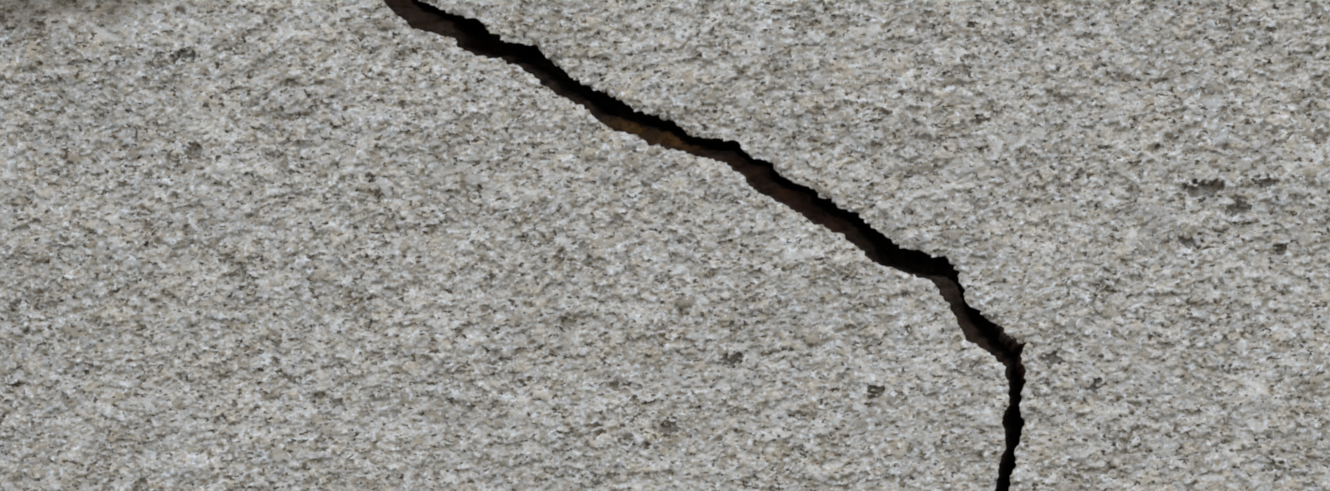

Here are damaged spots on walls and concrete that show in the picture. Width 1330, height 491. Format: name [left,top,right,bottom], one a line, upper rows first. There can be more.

crack [384,0,1027,491]